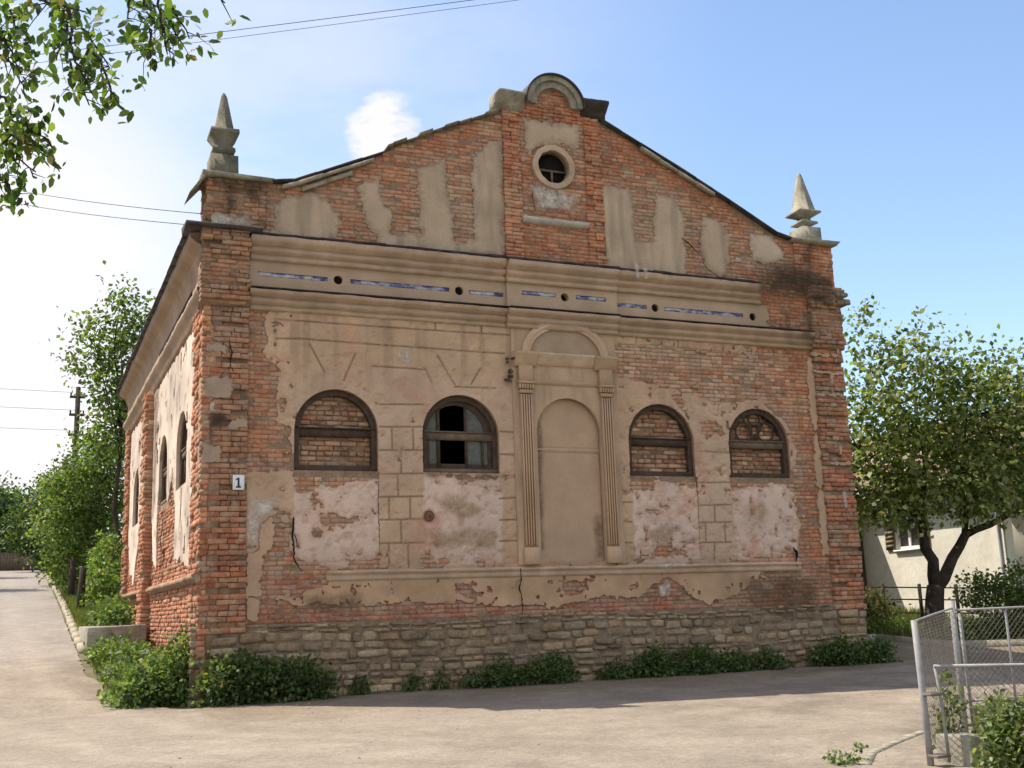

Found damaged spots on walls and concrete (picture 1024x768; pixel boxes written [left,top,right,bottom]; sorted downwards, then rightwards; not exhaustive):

spalling [266,108,797,293]
crack [291,517,302,571]
crack [513,568,523,630]
spalling [244,310,833,625]